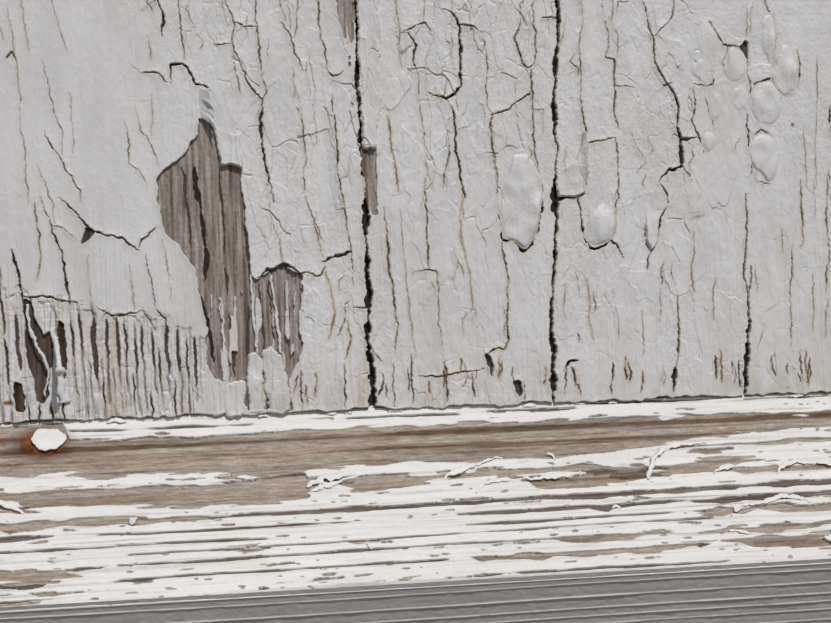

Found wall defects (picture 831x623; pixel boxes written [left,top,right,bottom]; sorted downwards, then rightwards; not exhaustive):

crack [0,190,76,319]
crack [145,0,208,88]
peeling [157,88,303,418]
crack [236,41,269,183]
peeling [335,0,382,215]
crack [261,0,618,407]
peeling [556,131,589,197]
crack [647,27,712,195]
crack [714,293,750,394]
rust [21,432,64,456]
peeling [0,293,831,594]
peeling [0,567,104,607]